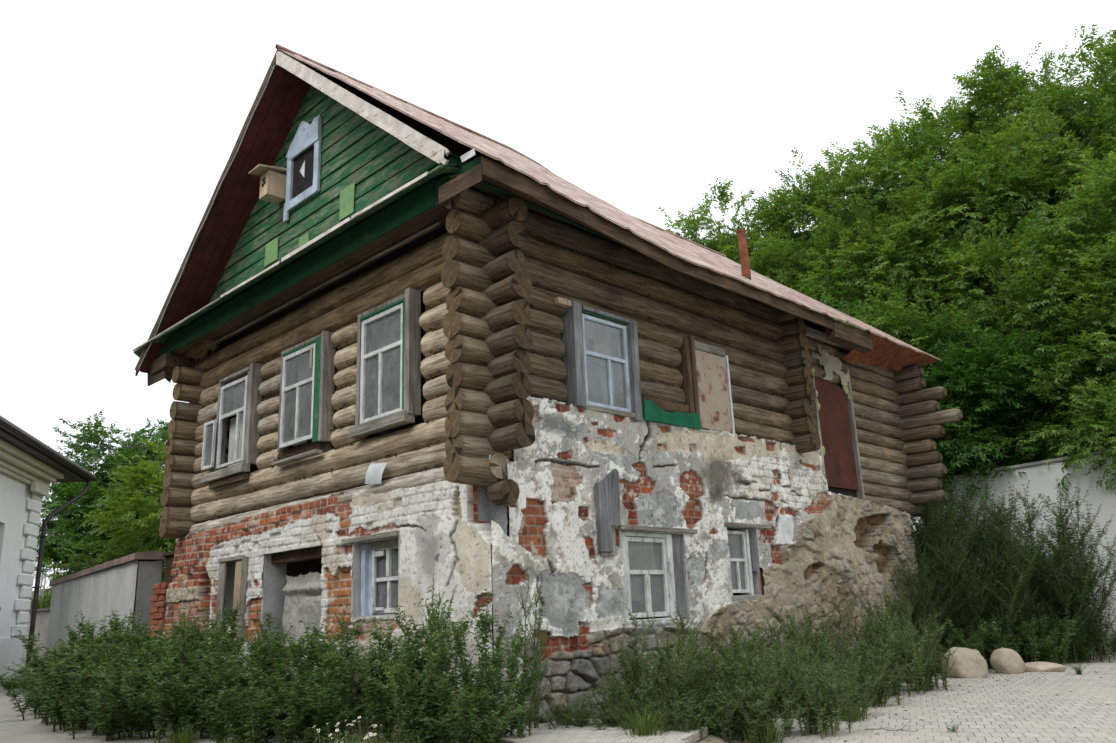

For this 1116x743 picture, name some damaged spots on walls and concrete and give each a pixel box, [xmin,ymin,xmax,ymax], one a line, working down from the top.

spalling [163,470,441,645]
flaking render [412,401,729,662]
flaking render [656,425,833,565]
spalling [803,563,825,581]
spalling [854,513,897,574]